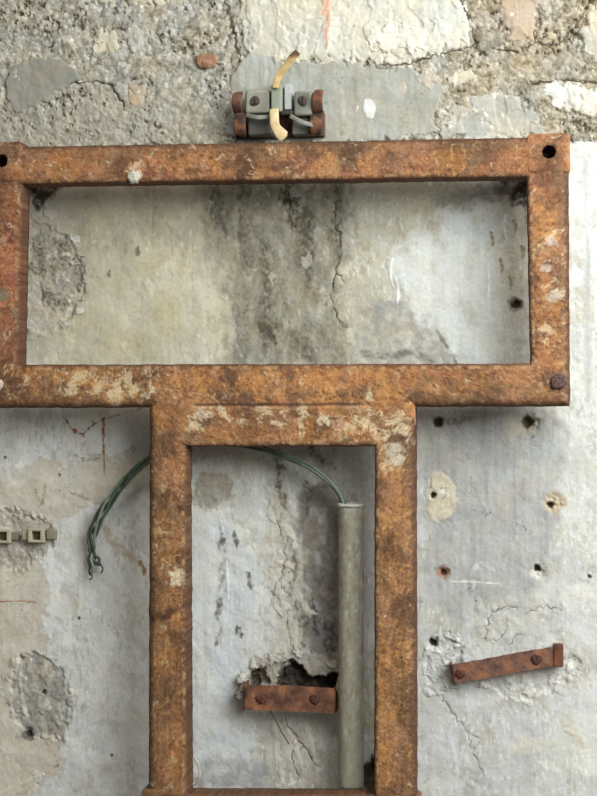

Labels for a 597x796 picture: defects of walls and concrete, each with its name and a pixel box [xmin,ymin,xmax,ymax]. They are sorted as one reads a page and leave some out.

spalling [0,0,597,147]
damp [190,183,459,364]
crack [324,194,343,327]
corrosion [61,407,144,475]
peeling [0,443,150,796]
corrosion [99,523,147,575]
peeling [192,469,339,772]
crack [273,489,300,657]
damp [293,480,348,658]
crack [485,605,561,645]
crack [284,716,319,779]
crack [438,693,484,772]